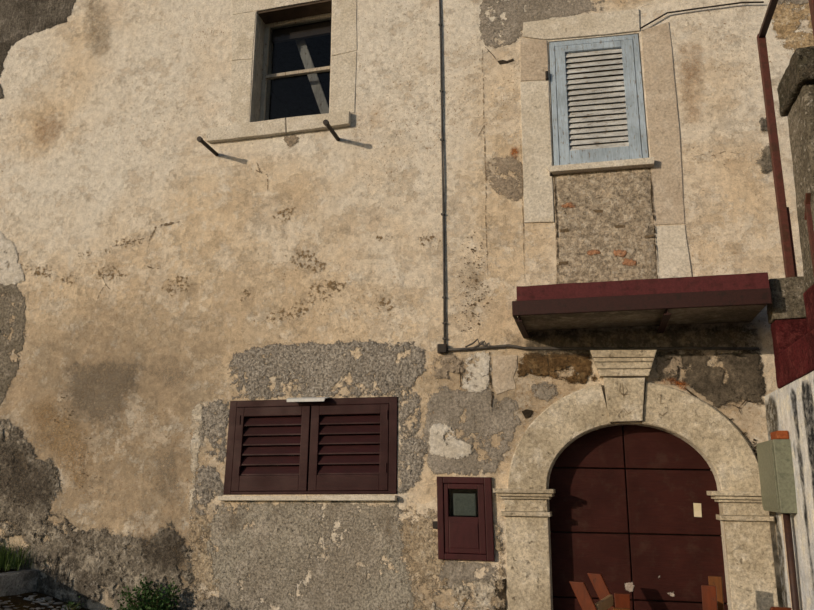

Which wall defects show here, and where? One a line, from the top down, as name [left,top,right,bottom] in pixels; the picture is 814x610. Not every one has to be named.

flaking render [0,0,76,99]
flaking render [479,0,605,48]
flaking render [772,1,814,52]
flaking render [0,284,26,404]
flaking render [422,352,600,476]
water stain [0,444,52,505]
water stain [791,382,814,546]